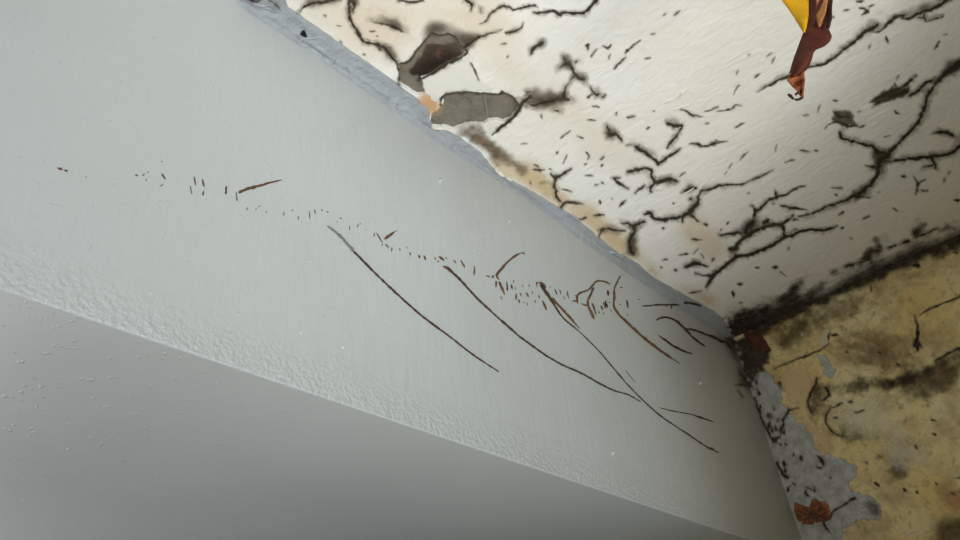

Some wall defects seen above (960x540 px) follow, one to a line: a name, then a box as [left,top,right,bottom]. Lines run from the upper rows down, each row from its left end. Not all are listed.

crack [299,0,424,85]
spalling [398,33,519,134]
crack [463,0,599,57]
leakage [464,126,542,187]
crack [492,0,960,297]
leakage [718,224,960,398]
leakage [807,377,846,437]
peeling [745,363,881,540]
leakage [937,521,960,540]